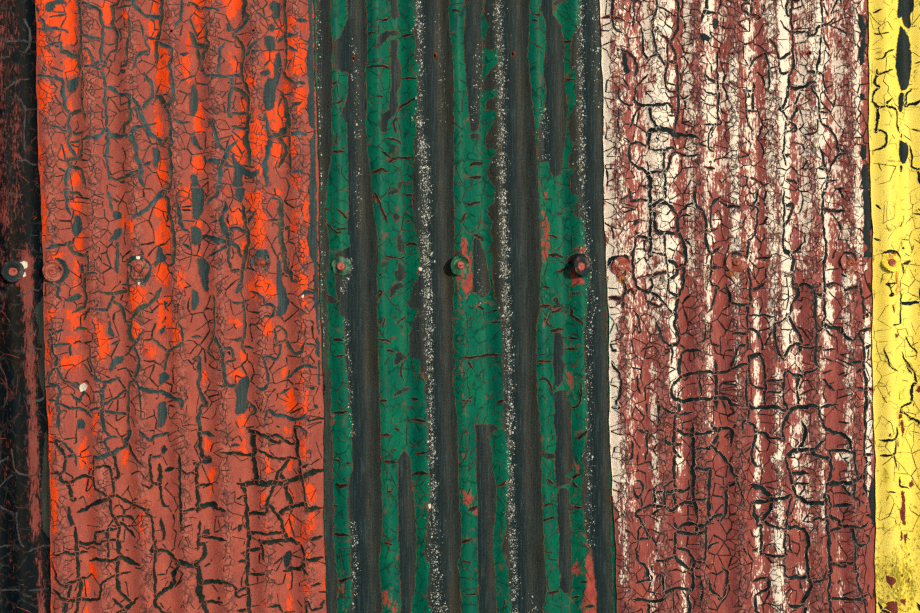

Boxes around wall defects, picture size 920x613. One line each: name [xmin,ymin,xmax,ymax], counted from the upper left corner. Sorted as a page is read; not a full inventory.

peeling [36,0,91,110]
peeling [147,0,169,94]
peeling [857,14,866,65]
peeling [895,0,915,115]
crack [451,91,496,254]
peeling [861,145,876,261]
peeling [898,129,910,176]
peeling [34,54,211,539]
peeling [227,0,614,613]
crack [526,0,920,613]
crack [457,537,505,613]
peeling [899,480,915,557]